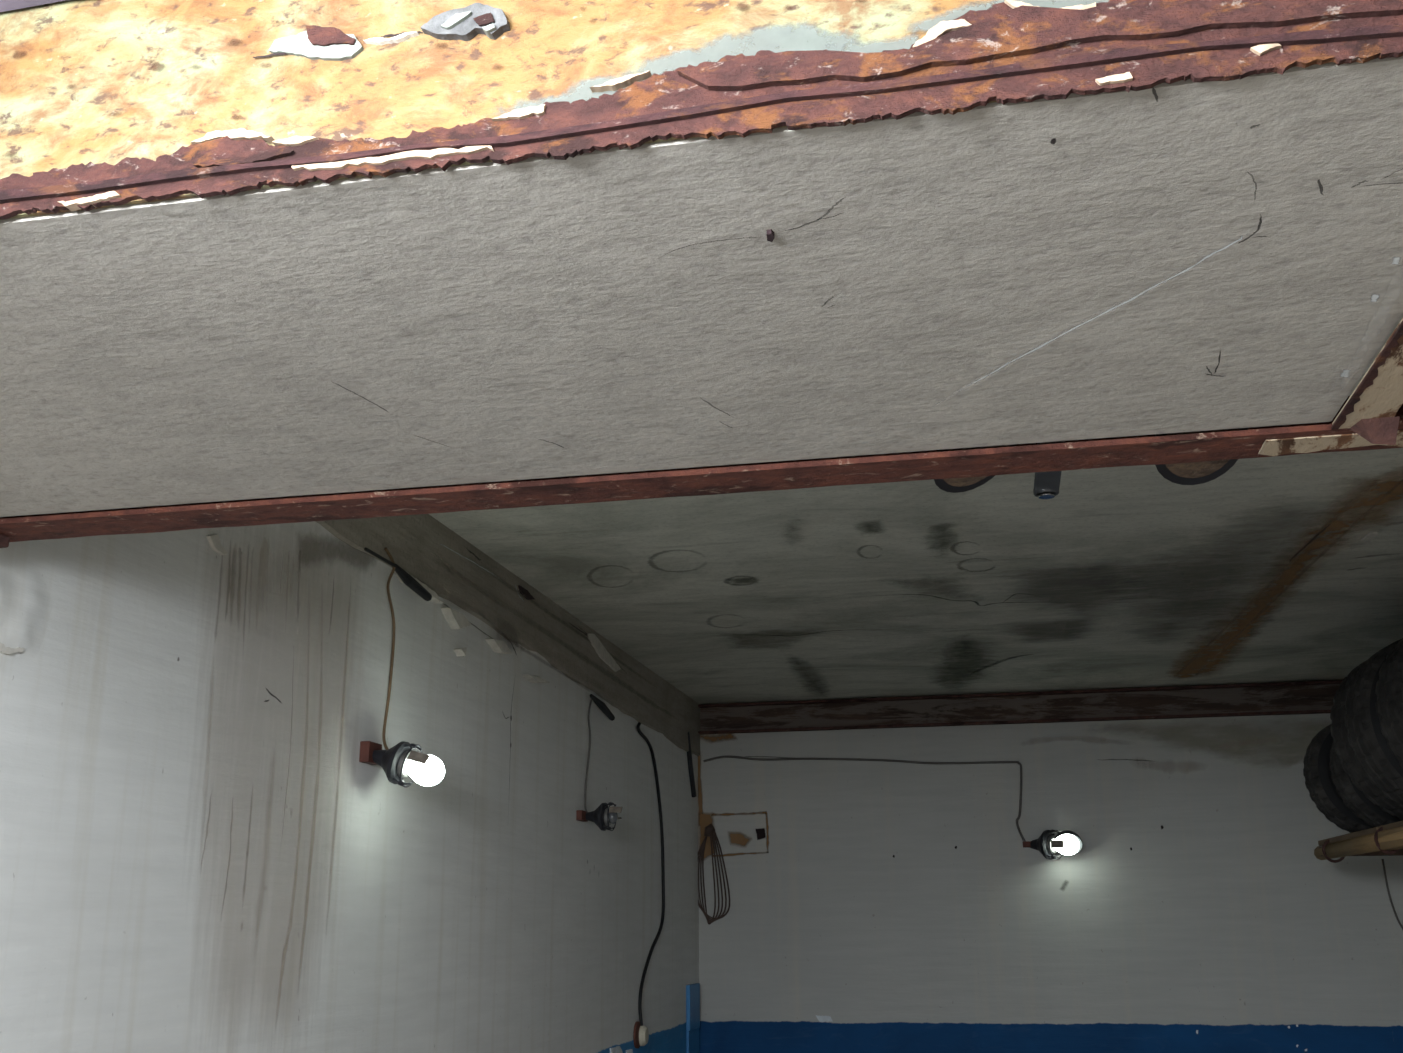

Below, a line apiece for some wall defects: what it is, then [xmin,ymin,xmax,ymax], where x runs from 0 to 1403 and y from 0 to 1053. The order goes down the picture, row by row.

peeling [253,3,510,61]
peeling [492,0,1109,121]
peeling [1250,43,1282,56]
peeling [1095,72,1133,86]
corrosion [0,0,1403,220]
peeling [190,128,319,146]
peeling [292,145,494,171]
peeling [57,191,122,212]